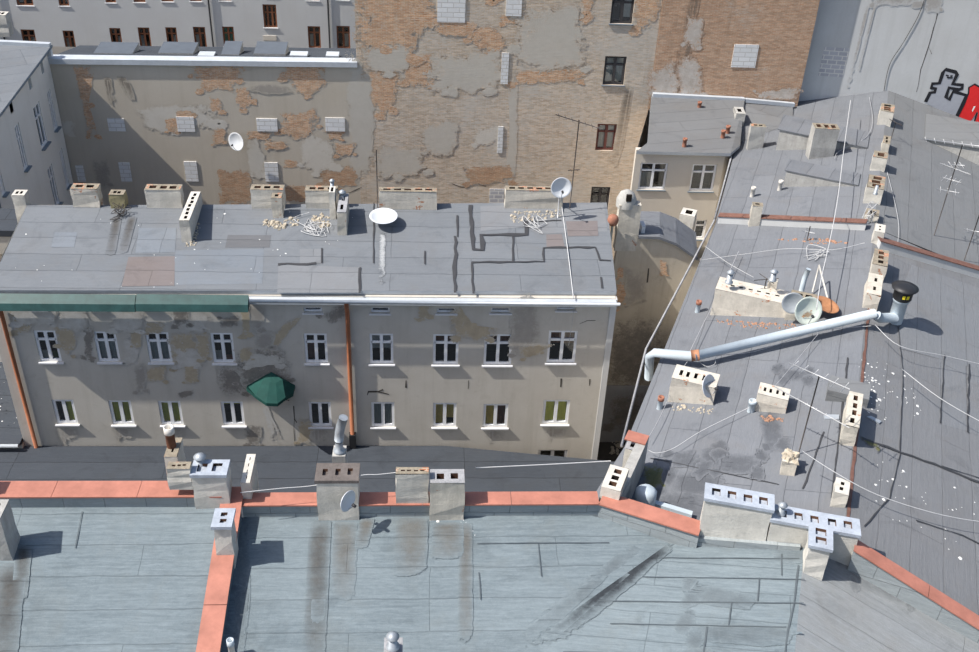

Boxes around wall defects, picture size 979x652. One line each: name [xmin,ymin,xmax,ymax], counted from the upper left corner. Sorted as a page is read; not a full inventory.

flaking render [628,0,661,37]
flaking render [73,64,103,141]
peeling [132,66,258,146]
flaking render [352,0,528,121]
flaking render [505,64,593,89]
leakage [13,544,32,598]
leakage [311,518,375,623]
leakage [393,518,473,643]